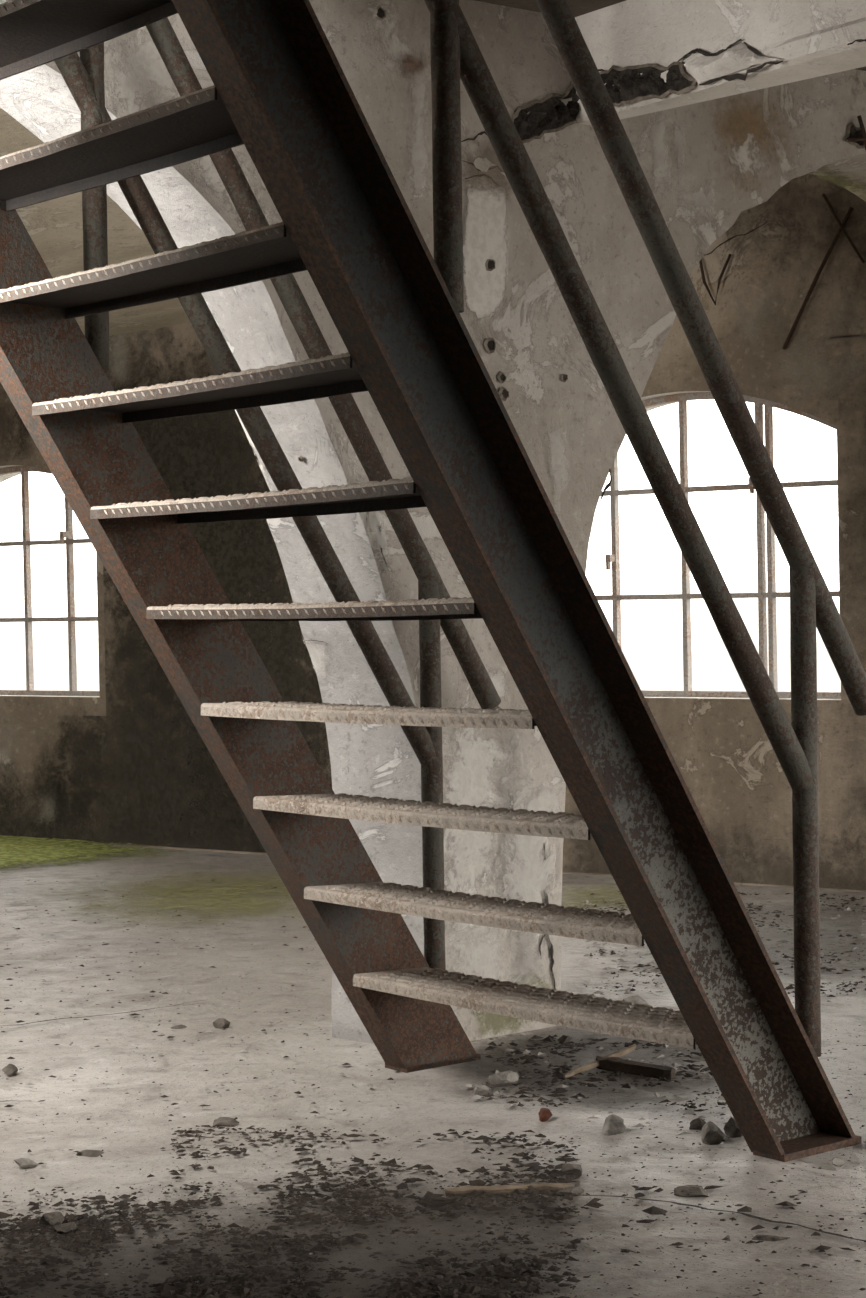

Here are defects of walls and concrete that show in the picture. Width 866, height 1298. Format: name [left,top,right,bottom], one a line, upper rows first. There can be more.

spalling [511,83,580,143]
spalling [599,62,696,107]
flaking render [843,115,866,150]
damp [103,337,211,392]
damp [132,410,270,500]
damp [187,519,293,605]
damp [241,621,323,704]
damp [0,589,266,853]
damp [295,721,332,788]
crack [539,842,556,990]